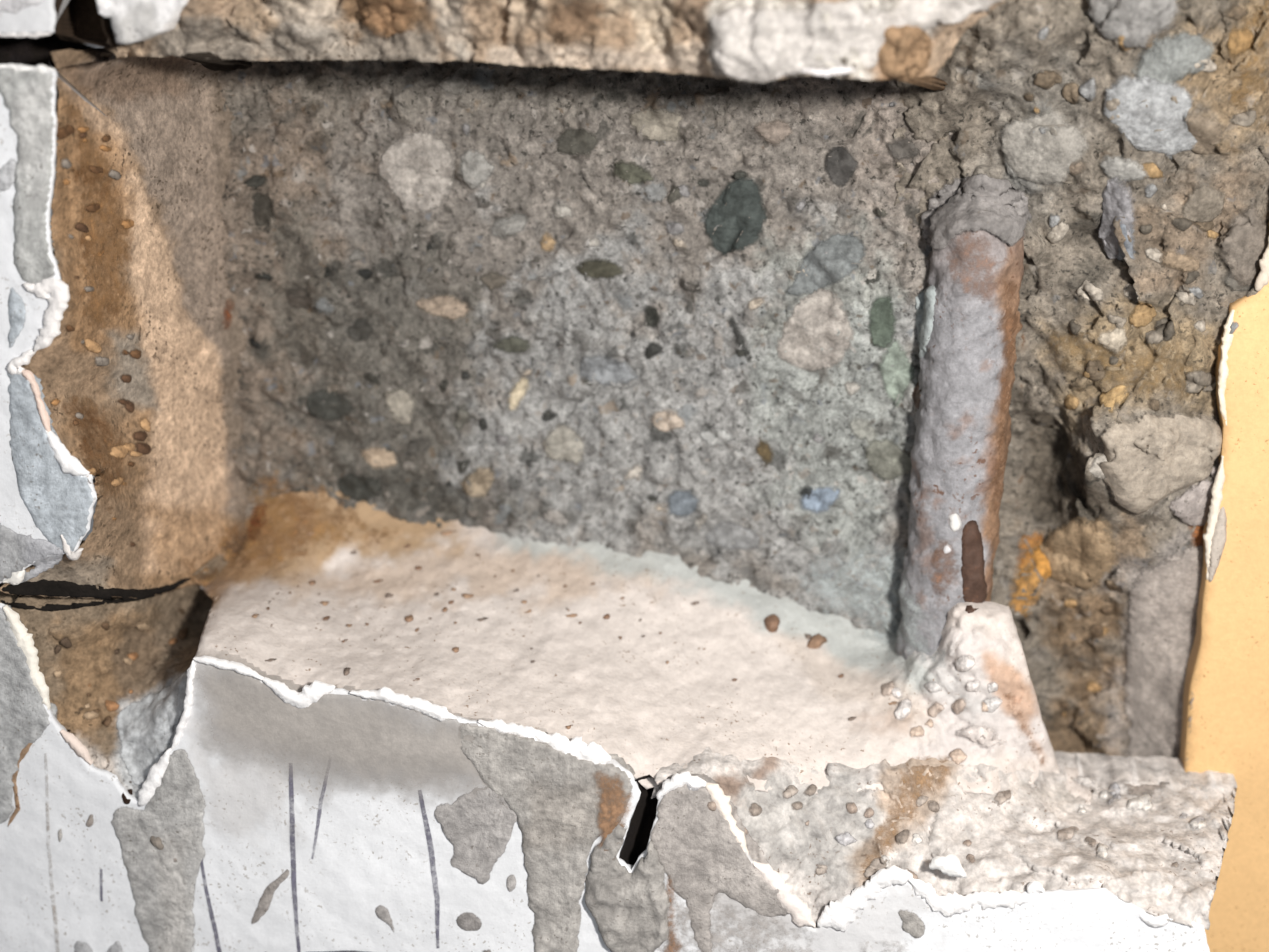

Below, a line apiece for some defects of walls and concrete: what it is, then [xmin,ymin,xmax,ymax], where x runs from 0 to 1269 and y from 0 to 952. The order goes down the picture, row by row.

damp [8,288,26,348]
damp [7,373,94,552]
spalling [0,0,1007,807]
spalling [651,0,1269,932]
rust [1001,308,1024,412]
rust [1011,533,1047,620]